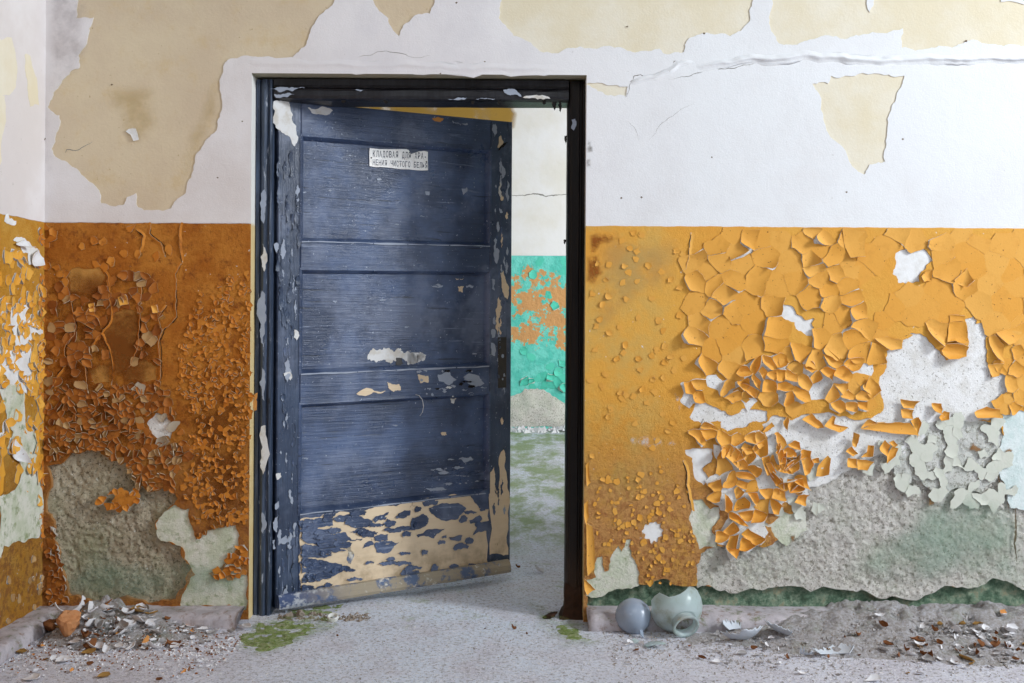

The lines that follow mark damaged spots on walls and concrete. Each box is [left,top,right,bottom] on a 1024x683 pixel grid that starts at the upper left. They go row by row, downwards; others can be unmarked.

peeling [0,0,334,230]
peeling [360,89,562,361]
peeling [499,0,753,54]
peeling [813,73,904,174]
peeling [769,0,1024,51]
flaking render [0,214,520,610]
flaking render [500,346,565,427]
flaking render [584,227,1024,600]